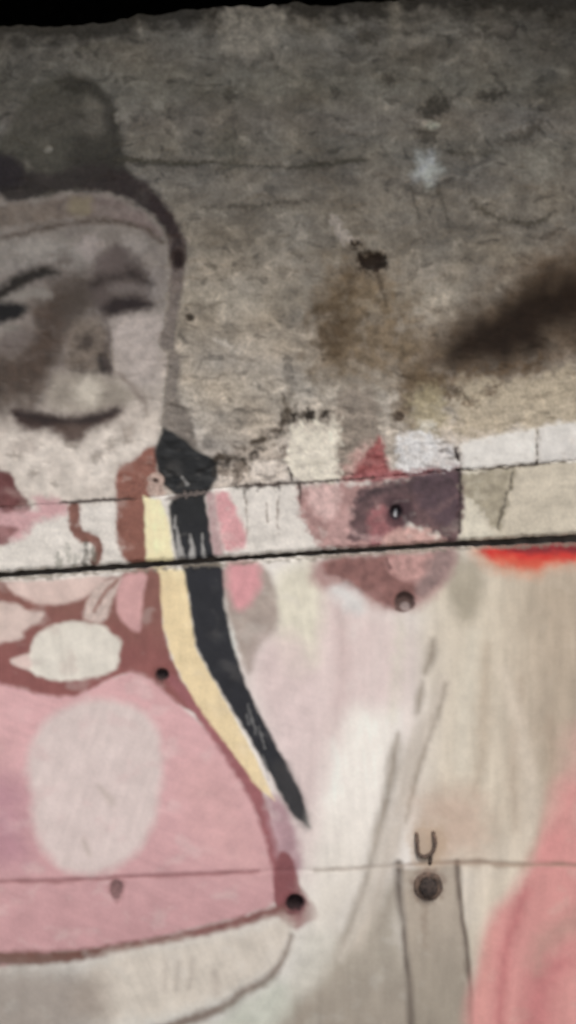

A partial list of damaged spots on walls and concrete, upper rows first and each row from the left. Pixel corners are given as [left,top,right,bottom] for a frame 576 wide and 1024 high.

damp [210,242,576,489]
crack [57,495,137,507]
crack [237,465,377,538]